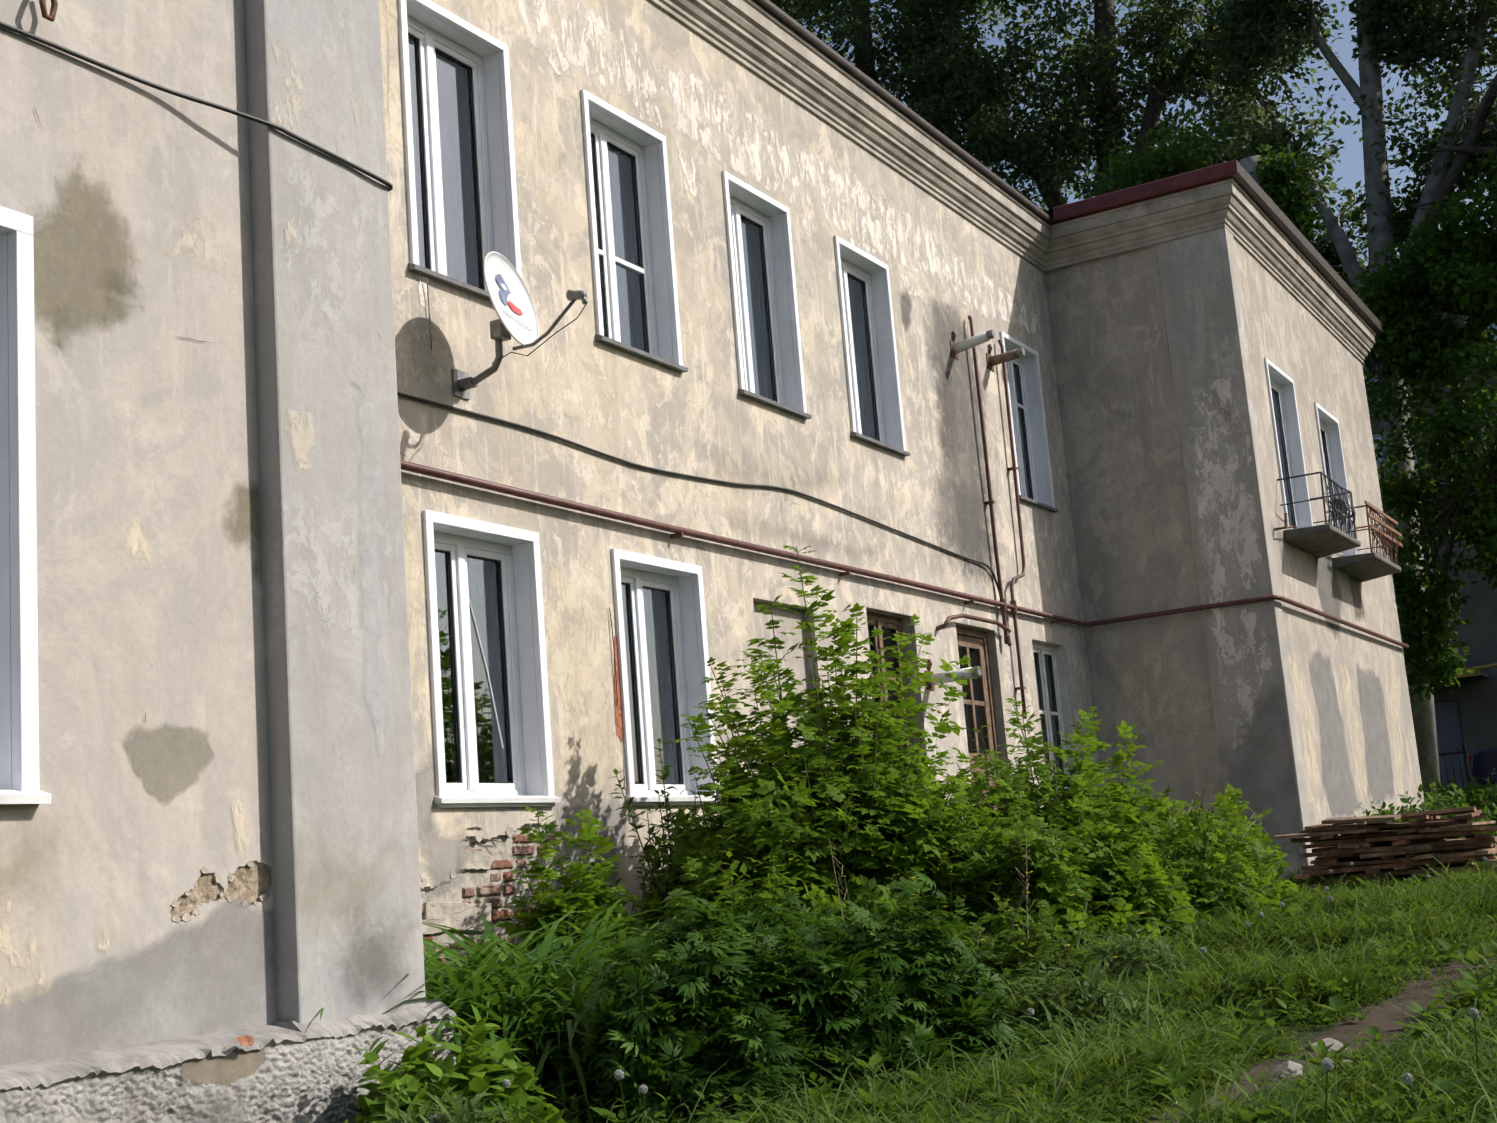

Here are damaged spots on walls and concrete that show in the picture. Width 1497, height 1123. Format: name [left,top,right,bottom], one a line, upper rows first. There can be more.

water stain [33,176,131,347]
water stain [930,312,988,565]
peeling [1191,377,1272,750]
flaking render [170,802,270,922]
flaking render [420,826,566,970]
spalling [237,1035,254,1046]